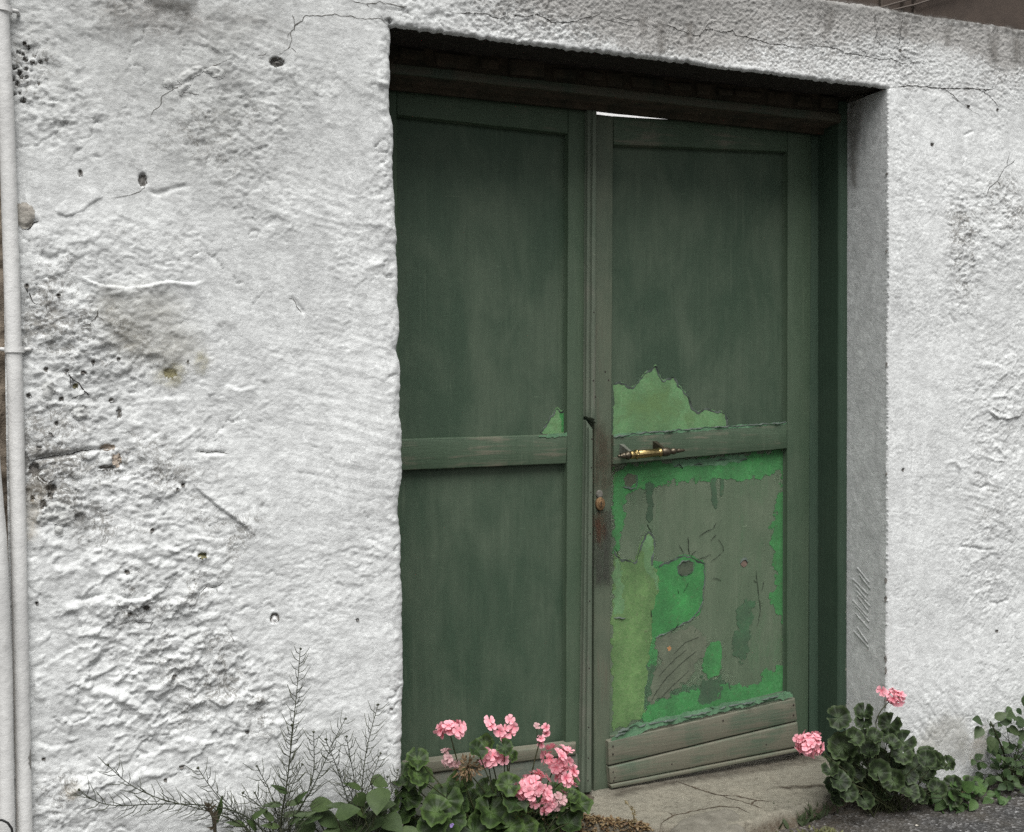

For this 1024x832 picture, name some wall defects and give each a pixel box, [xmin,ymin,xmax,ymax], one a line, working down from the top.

crack [152,59,229,113]
crack [258,1,407,56]
crack [452,12,999,115]
peeling [539,407,567,438]
peeling [612,364,787,438]
peeling [610,449,793,741]